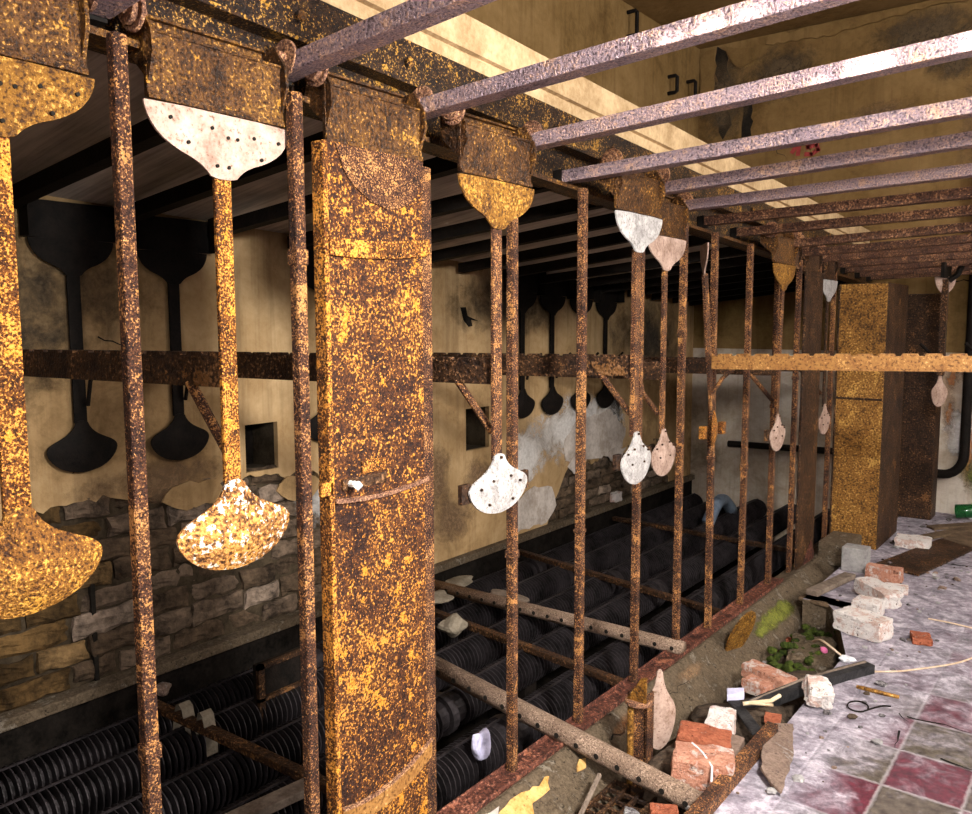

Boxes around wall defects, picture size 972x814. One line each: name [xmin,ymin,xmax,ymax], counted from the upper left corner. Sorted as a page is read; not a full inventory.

corrosion [946,372,959,389]
flaking render [518,409,668,532]
flaking render [0,495,136,713]
flaking render [148,465,299,661]
flaking render [312,472,322,603]